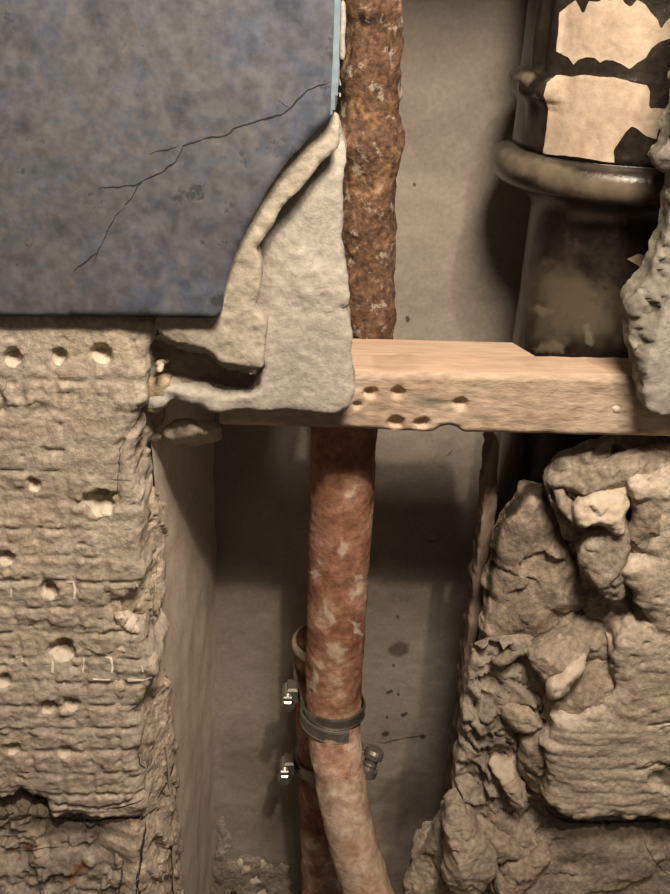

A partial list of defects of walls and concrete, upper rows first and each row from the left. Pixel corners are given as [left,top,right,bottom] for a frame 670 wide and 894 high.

crack [75,83,327,270]
peeling [628,254,645,267]
crack [0,744,175,894]
spalling [211,816,301,894]